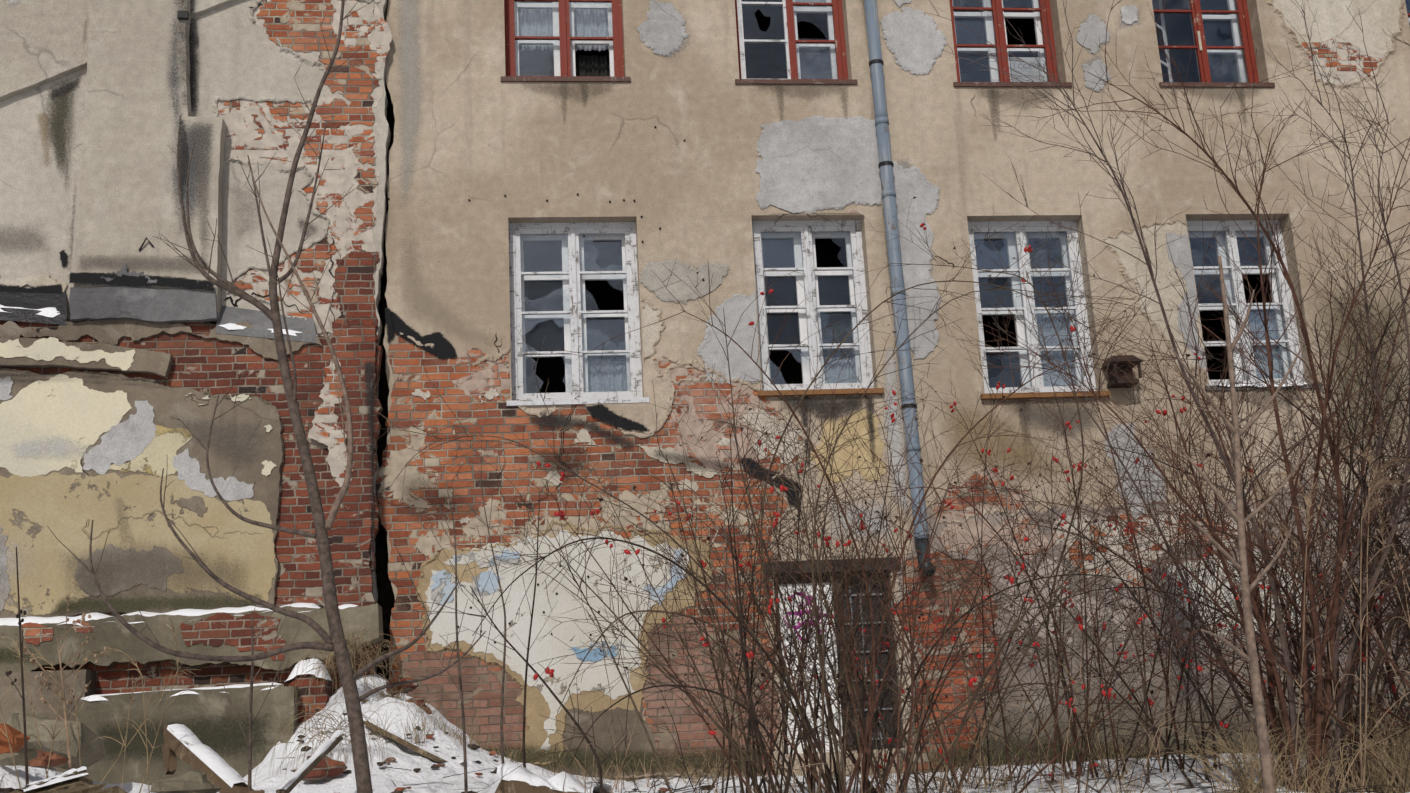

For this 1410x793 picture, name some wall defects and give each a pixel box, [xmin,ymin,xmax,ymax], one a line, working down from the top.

water stain [169,0,209,233]
peeling [1266,0,1405,90]
peeling [0,368,286,660]
flaking render [212,0,907,778]
peeling [894,466,1410,774]
peeling [1100,217,1207,375]